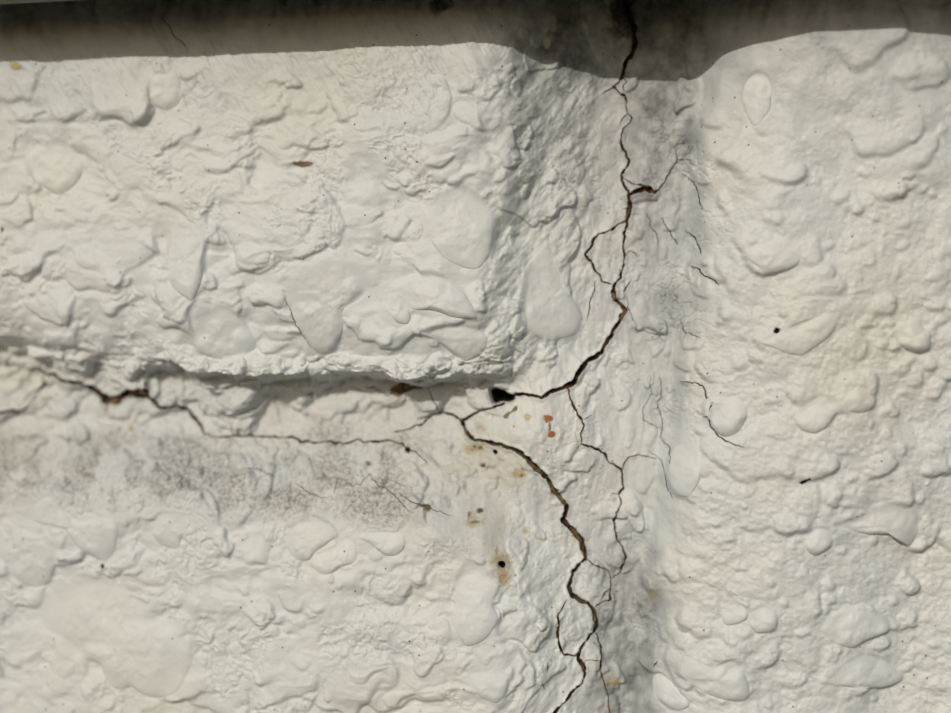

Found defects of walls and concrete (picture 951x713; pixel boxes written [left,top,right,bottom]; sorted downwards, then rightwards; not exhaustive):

crack [0,0,744,713]